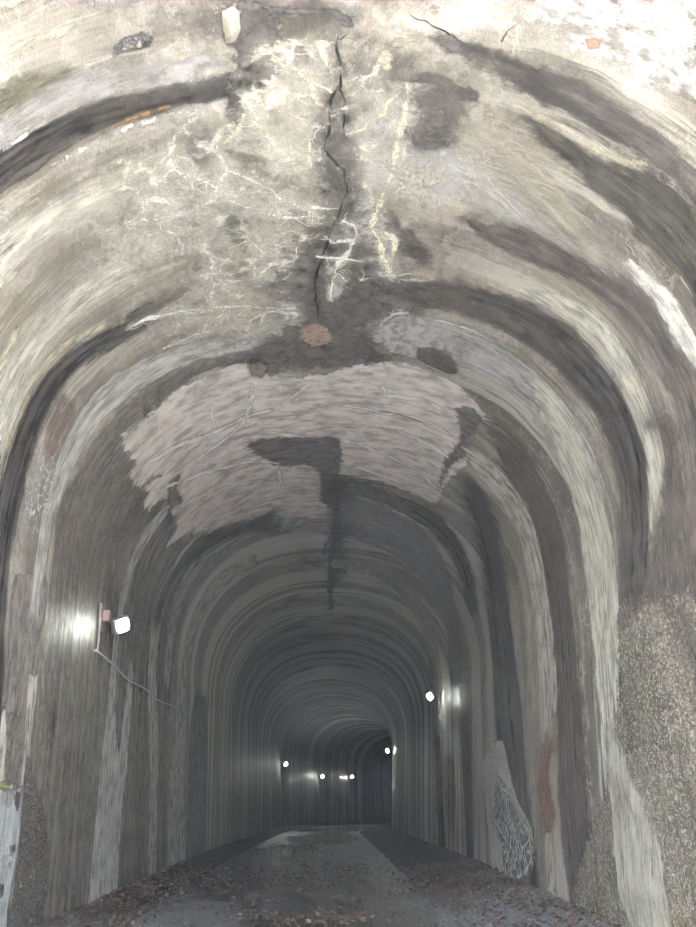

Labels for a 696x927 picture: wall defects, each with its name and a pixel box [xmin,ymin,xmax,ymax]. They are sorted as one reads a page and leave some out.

spalling [113,32,153,58]
damp [353,35,418,96]
crack [411,15,468,44]
corrosion [585,37,601,49]
damp [133,116,203,194]
damp [194,180,258,252]
crack [124,30,429,349]
damp [197,232,277,304]
peeling [120,361,492,547]
peeling [0,573,50,927]
spalling [572,580,696,927]
peeling [482,739,535,885]